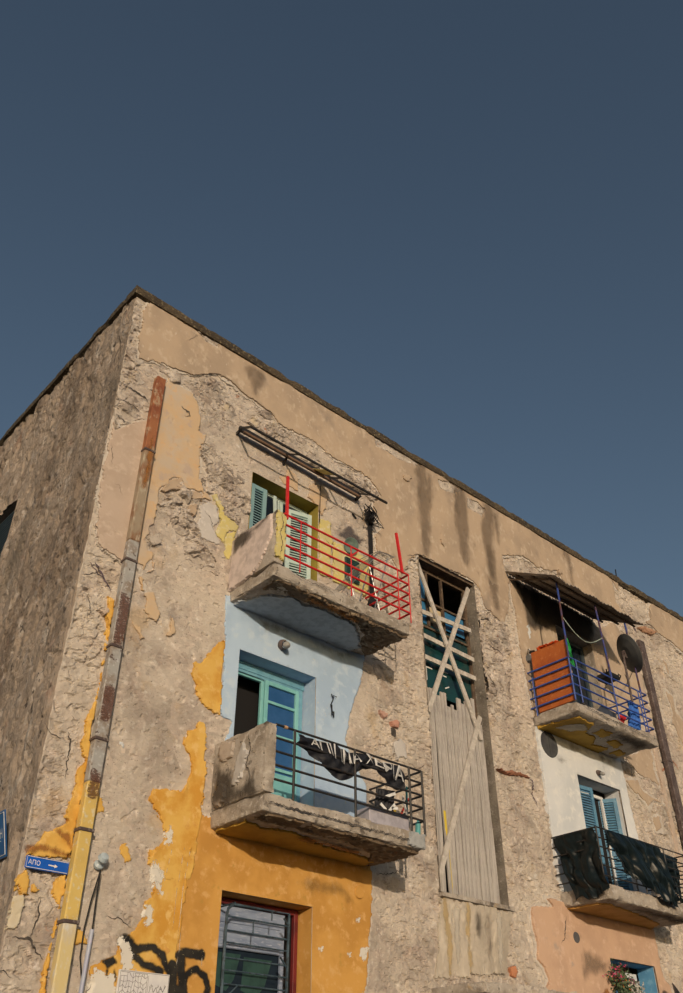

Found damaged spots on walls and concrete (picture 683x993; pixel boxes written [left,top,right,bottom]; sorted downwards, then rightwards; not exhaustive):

spalling [113,297,379,576]
peeling [191,640,226,715]
spalling [477,610,512,723]
peeling [25,595,115,859]
spalling [494,767,530,778]
peeling [537,716,626,756]
peeling [13,870,39,895]
peeling [84,721,207,993]
peeling [39,875,66,993]
peeling [74,929,87,945]
water stain [443,899,480,975]